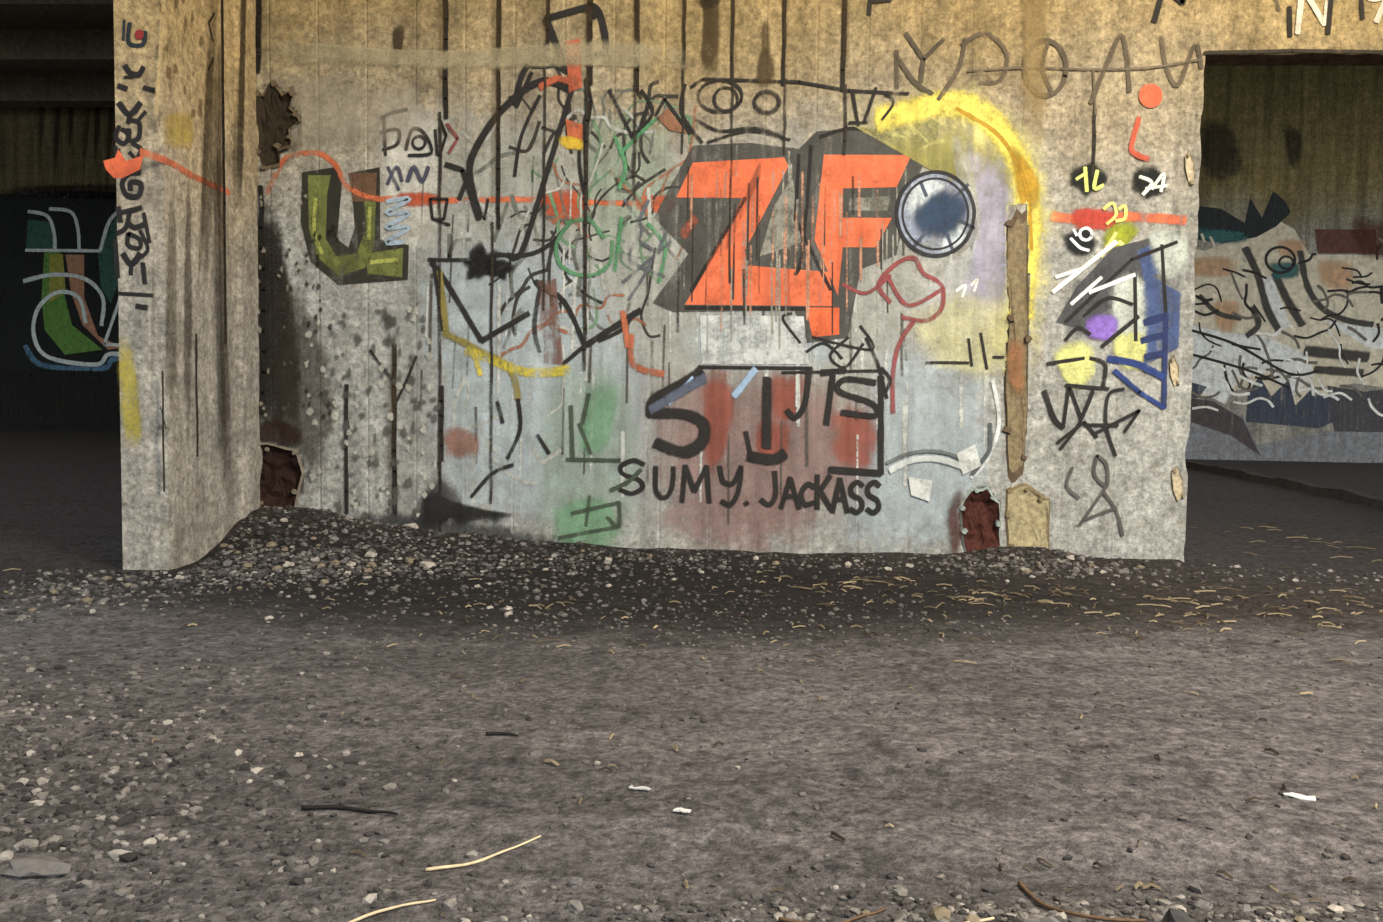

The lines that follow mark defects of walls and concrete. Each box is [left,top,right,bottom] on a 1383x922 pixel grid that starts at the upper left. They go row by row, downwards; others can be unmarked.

leakage [217,0,339,465]
peeling [260,306,442,520]
spalling [886,209,1050,552]